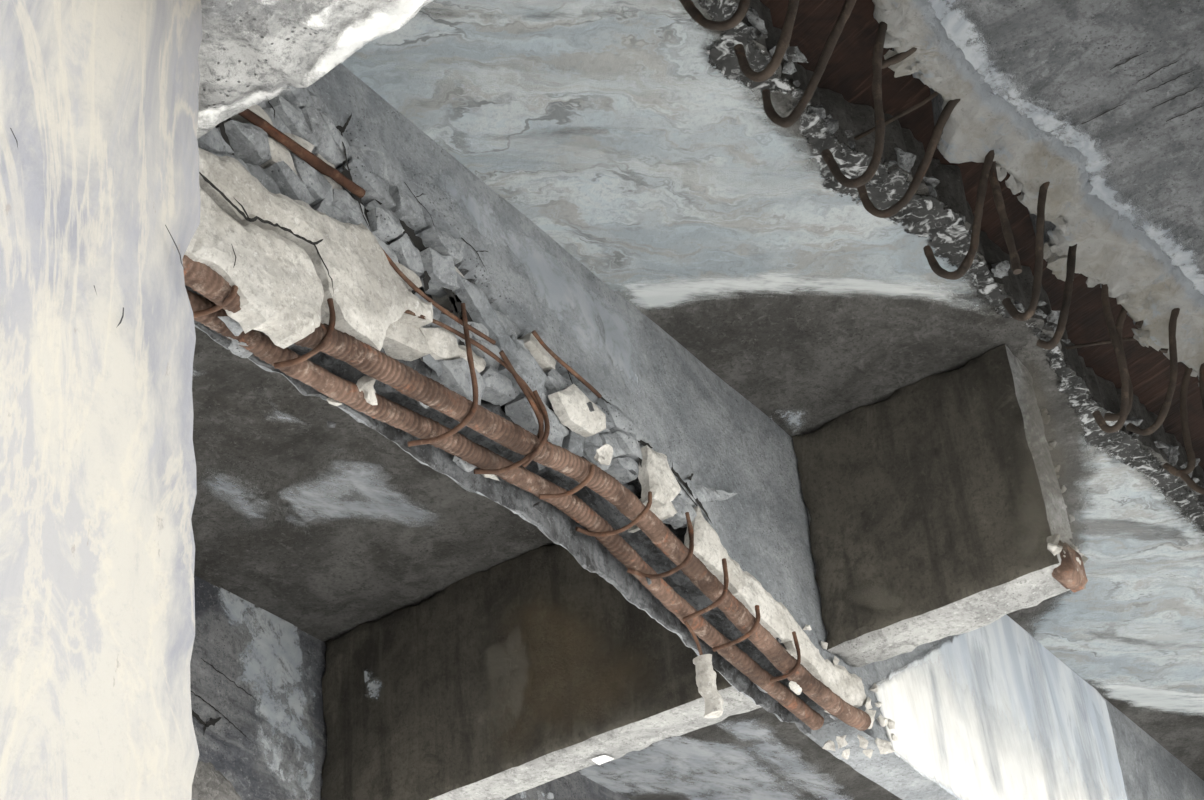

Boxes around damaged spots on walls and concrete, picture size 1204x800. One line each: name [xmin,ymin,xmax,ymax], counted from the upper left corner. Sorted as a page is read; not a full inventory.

crack [219,118,239,155]
spalling [679,0,967,218]
crack [199,172,334,297]
spalling [923,150,1077,350]
spalling [183,86,897,759]
leakage [307,0,1204,800]
leakage [209,478,258,516]
leakage [285,465,429,521]
crack [190,690,252,742]
crack [201,658,261,703]
leakage [219,588,315,798]
spalling [192,761,242,800]